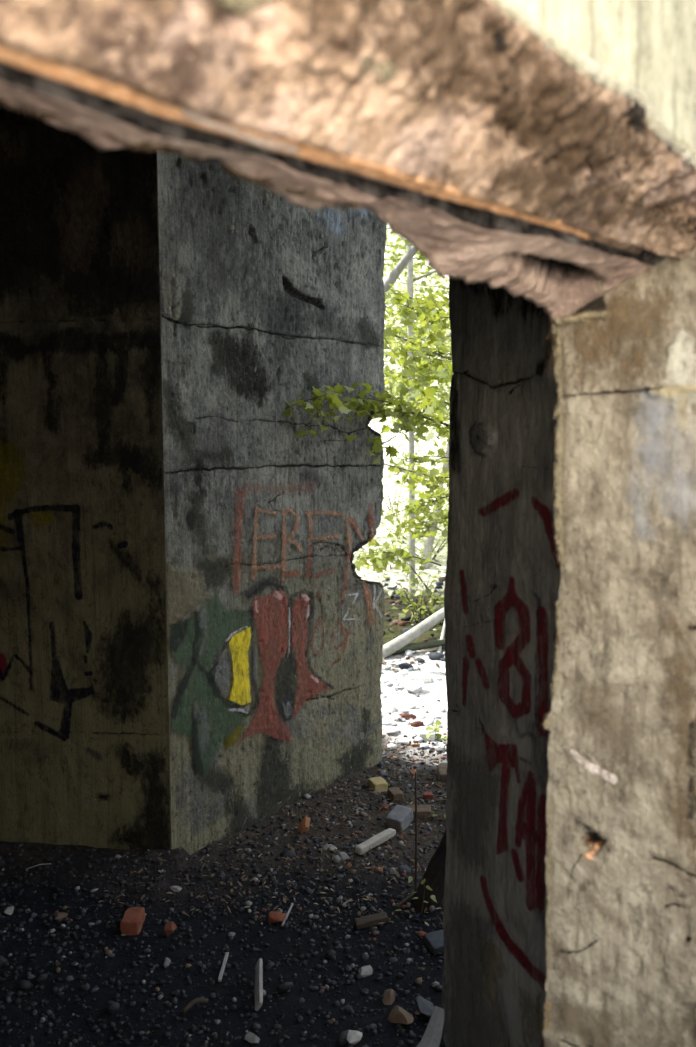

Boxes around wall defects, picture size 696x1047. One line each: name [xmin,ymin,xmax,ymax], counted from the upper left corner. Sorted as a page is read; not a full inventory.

spalling [216,0,272,16]
spalling [285,0,696,180]
spalling [524,254,605,292]
crack [162,306,379,346]
crack [165,413,381,474]
spalling [312,528,384,587]